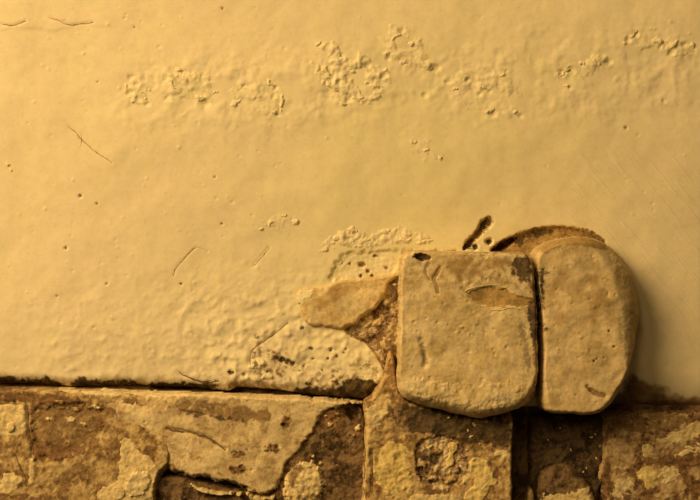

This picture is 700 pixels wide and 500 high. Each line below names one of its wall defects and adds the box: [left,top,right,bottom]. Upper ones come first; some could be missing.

spalling [318,224,433,369]